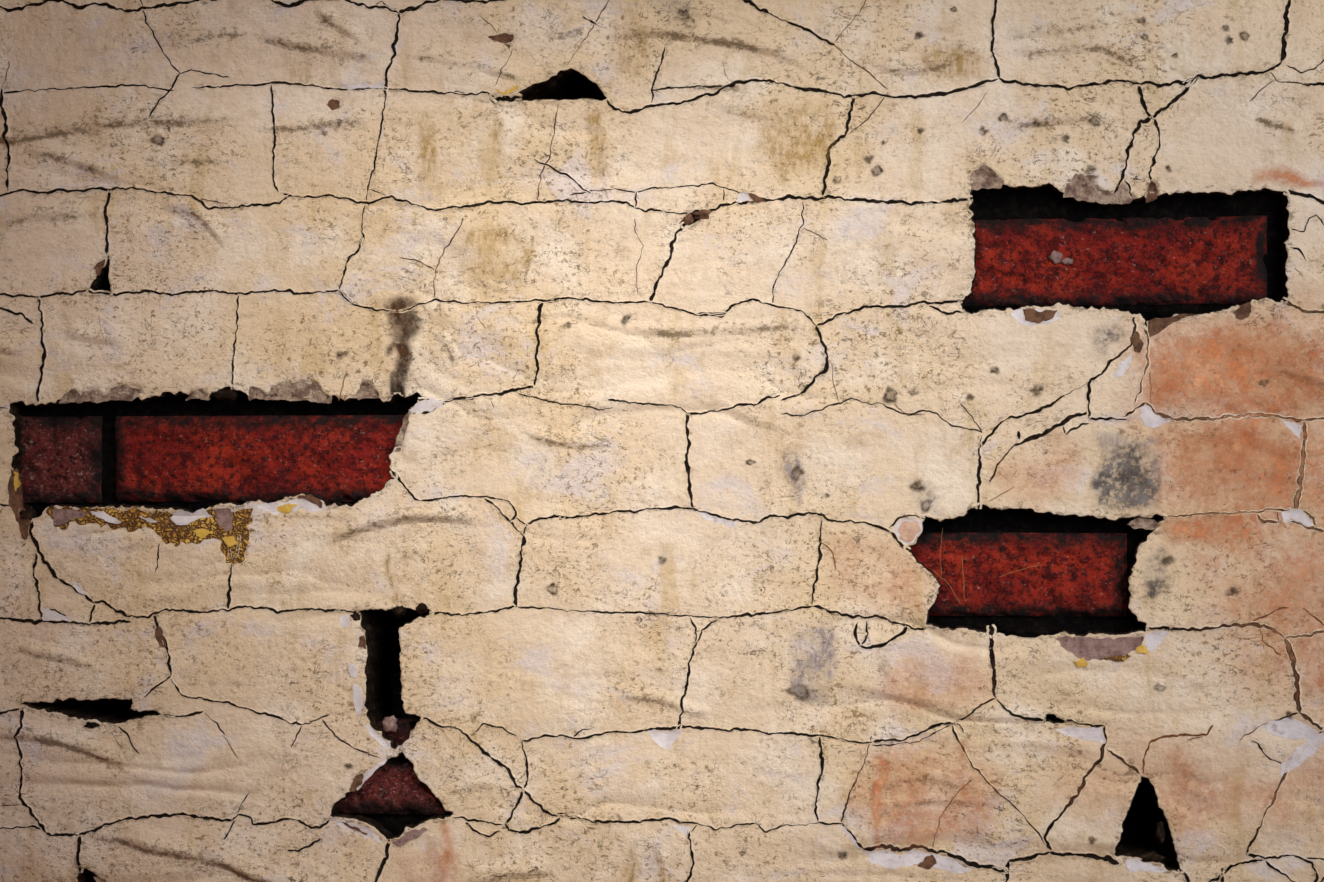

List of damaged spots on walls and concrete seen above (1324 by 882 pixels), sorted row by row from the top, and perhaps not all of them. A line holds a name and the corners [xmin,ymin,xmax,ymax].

crack [0,0,740,259]
crack [605,0,1324,208]
spalling [6,381,445,564]
damp [387,298,417,400]
crack [0,202,1213,882]
spalling [894,482,1169,668]
spalling [957,165,1293,378]
mould [1092,440,1160,508]
crack [974,314,1324,525]
spalling [327,603,456,846]
spalling [1110,773,1185,875]
crack [1146,607,1324,882]